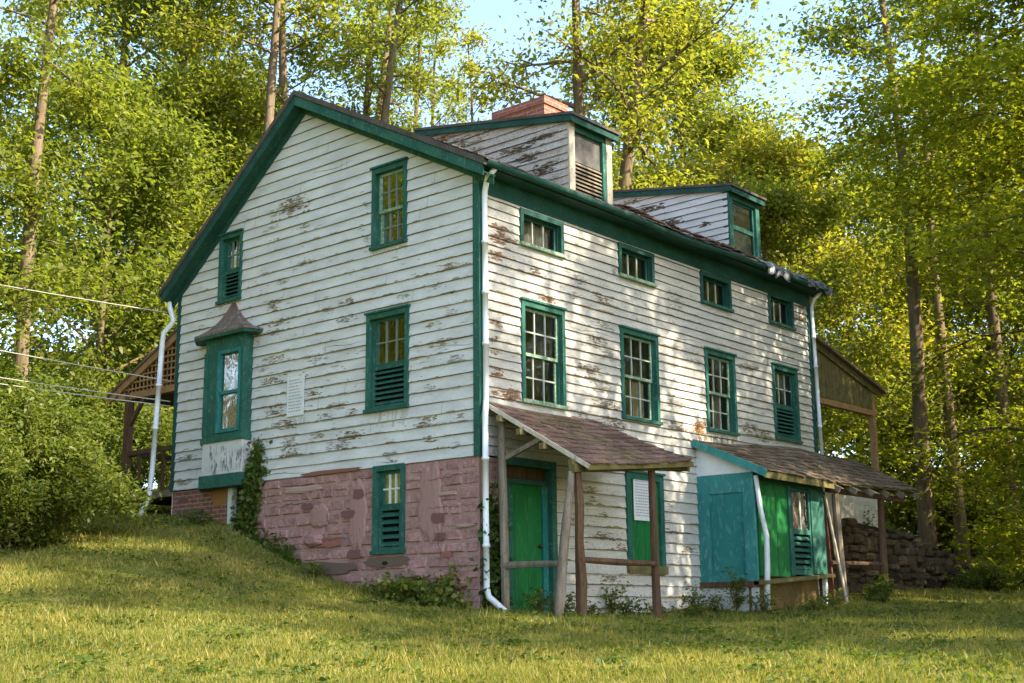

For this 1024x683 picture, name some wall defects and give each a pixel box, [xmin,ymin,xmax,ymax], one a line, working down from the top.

peeling [500,131,559,182]
peeling [263,192,313,251]
peeling [489,222,519,261]
peeling [620,198,685,224]
peeling [324,297,358,326]
peeling [425,309,464,363]
peeling [490,320,521,404]
peeling [571,318,627,431]
peeling [265,401,362,457]
peeling [413,415,460,449]
peeling [661,396,708,440]
peeling [739,422,777,444]